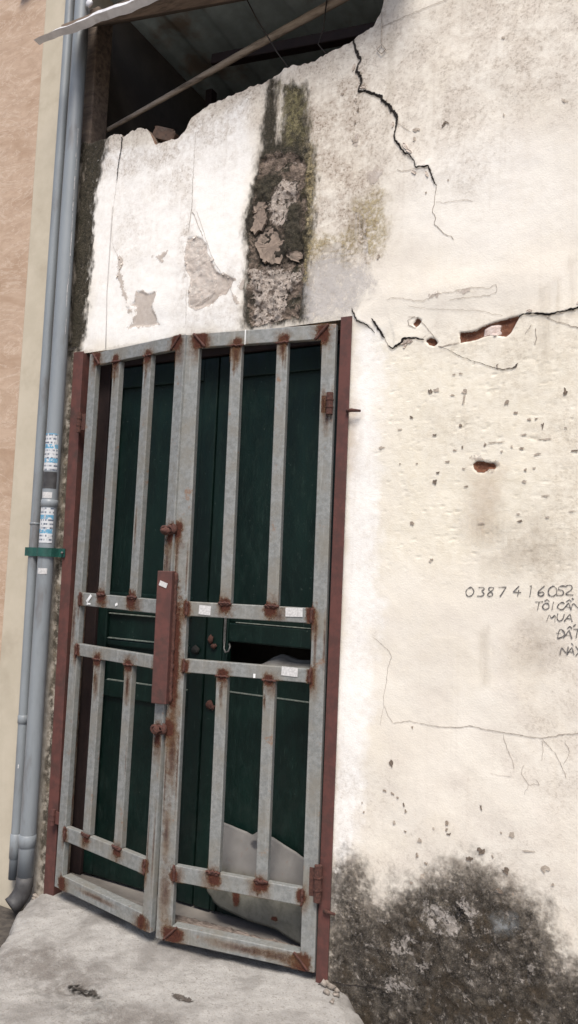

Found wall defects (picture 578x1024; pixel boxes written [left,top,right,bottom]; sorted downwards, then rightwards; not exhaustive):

spalling [184,150,308,327]
leakage [243,79,316,329]
crack [352,40,470,239]
crack [351,284,578,370]
flaking render [460,316,519,343]
leakage [39,138,109,887]
spalling [473,443,499,473]
rust [154,586,191,798]
crack [376,639,578,791]
rust [162,926,183,943]
rust [227,944,311,972]
leakage [328,865,578,1024]